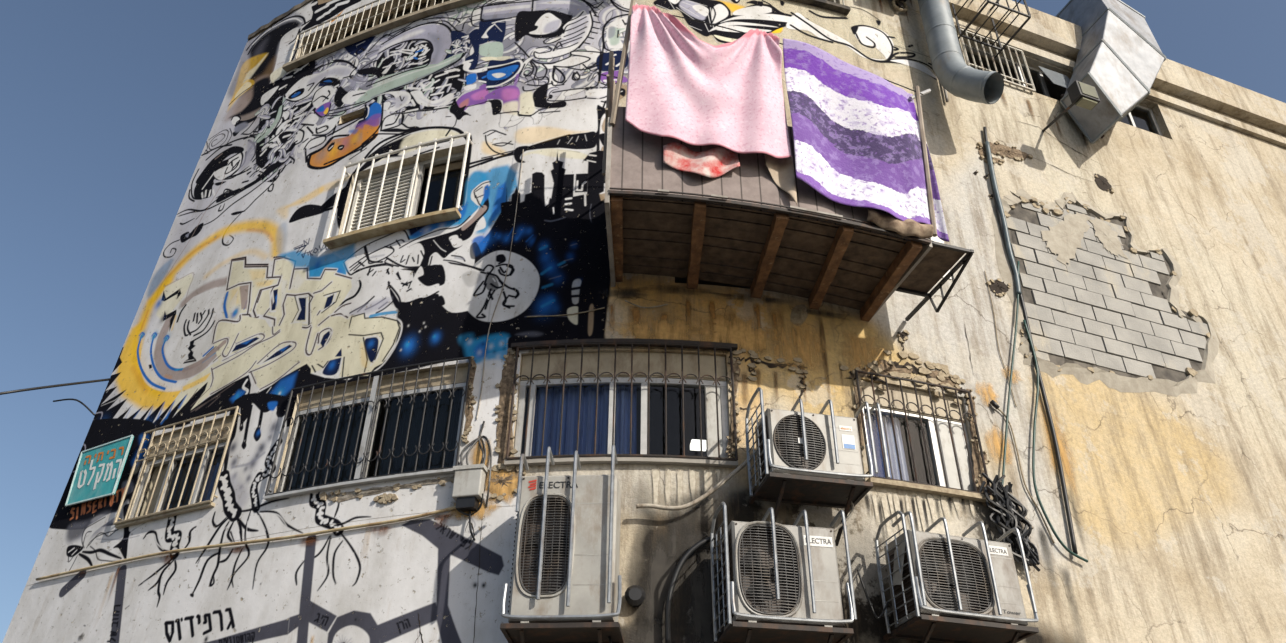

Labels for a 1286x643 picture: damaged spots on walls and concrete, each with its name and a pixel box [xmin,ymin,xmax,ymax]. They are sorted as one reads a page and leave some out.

flaking render [974,140,1220,397]
leakage [611,287,878,391]
spalling [484,348,526,502]
leakage [978,385,997,404]
leakage [988,429,1010,459]
leakage [1044,408,1070,477]